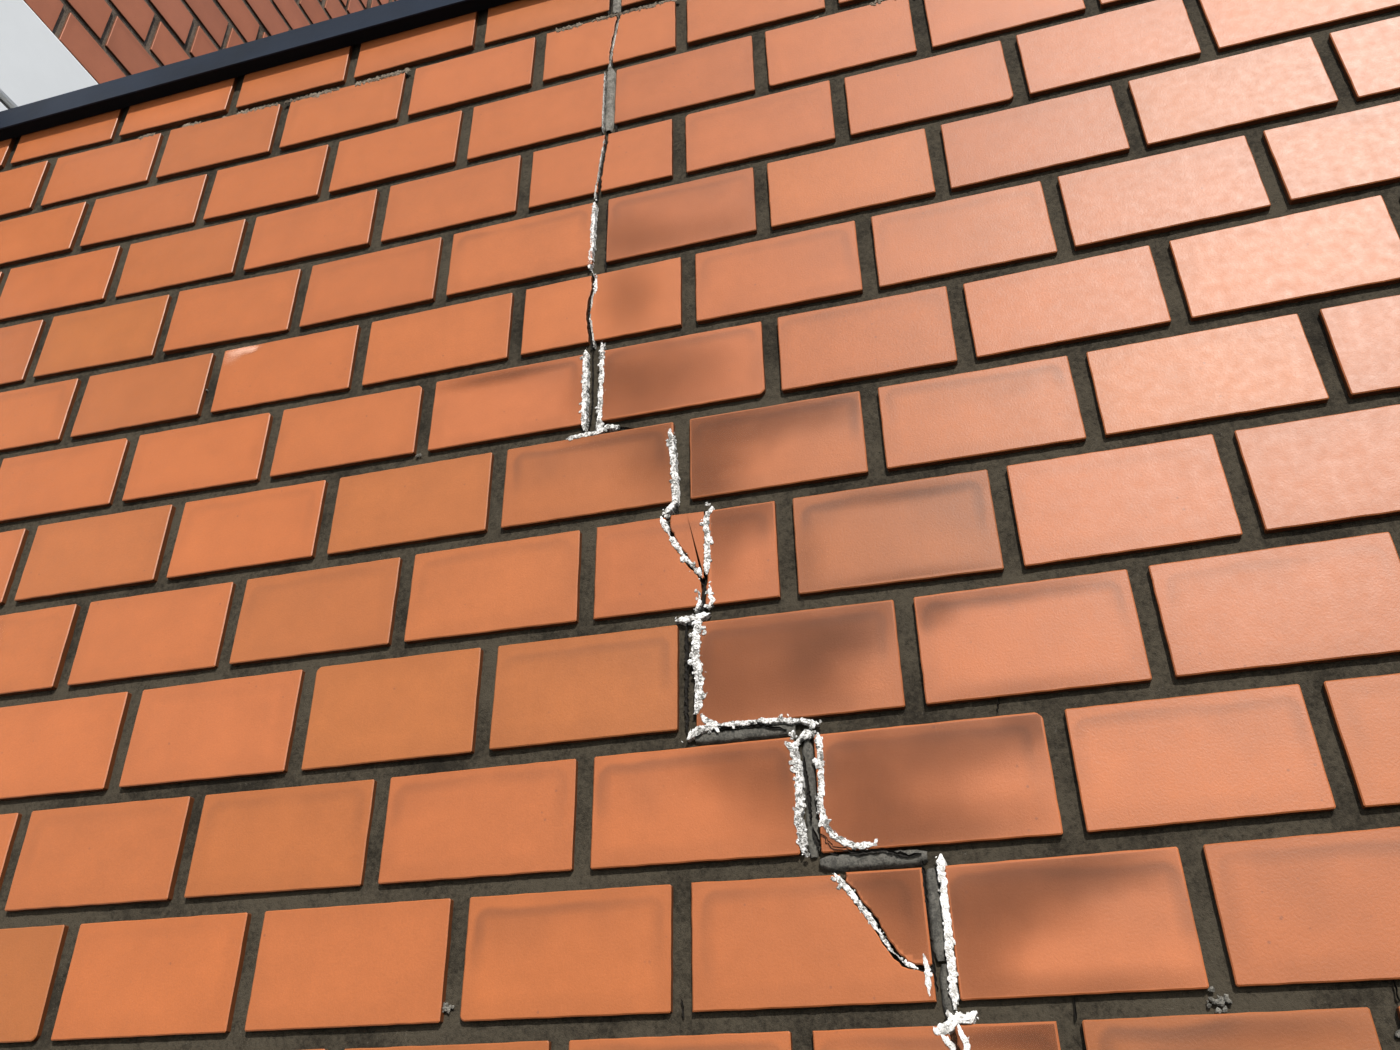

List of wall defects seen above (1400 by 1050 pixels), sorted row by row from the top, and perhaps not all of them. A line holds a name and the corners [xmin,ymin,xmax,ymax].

crack [588,124,634,432]
crack [662,499,939,992]